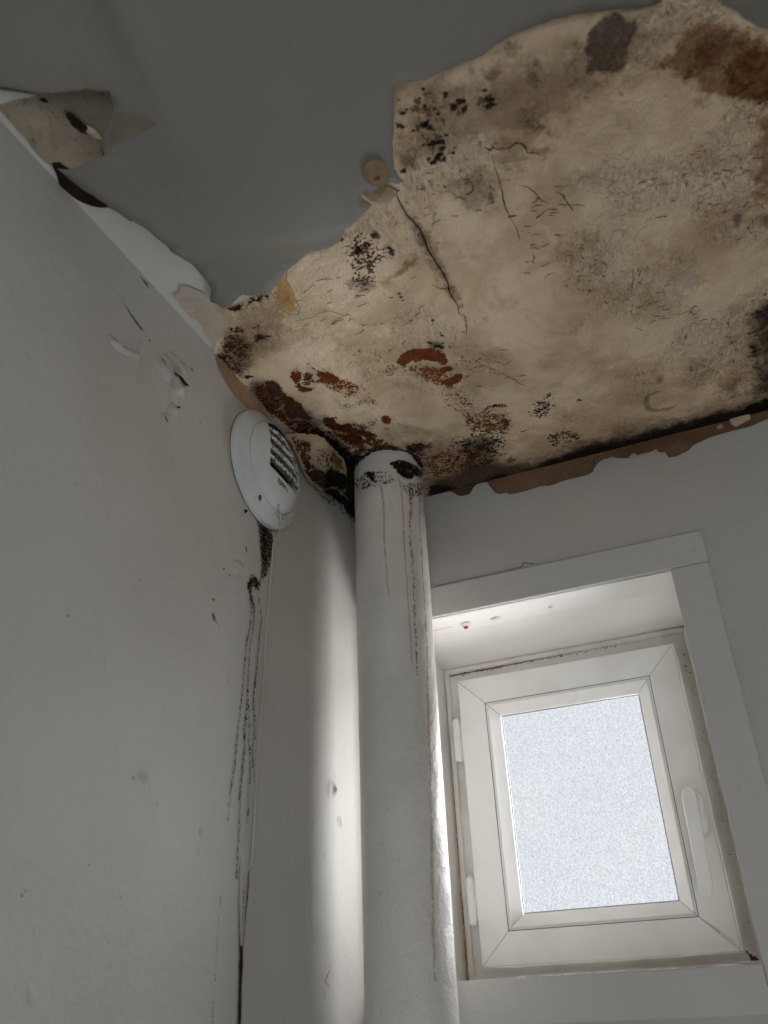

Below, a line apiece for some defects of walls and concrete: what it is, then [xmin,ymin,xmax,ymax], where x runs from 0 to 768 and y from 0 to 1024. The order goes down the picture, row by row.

leakage [584,12,637,73]
leakage [660,23,768,105]
leakage [396,87,498,166]
leakage [227,280,296,312]
leakage [340,232,395,290]
spalling [0,0,768,497]
crack [392,188,467,335]
leakage [217,325,271,376]
corrosion [245,348,517,479]
leakage [287,304,768,677]
leakage [227,520,273,1024]